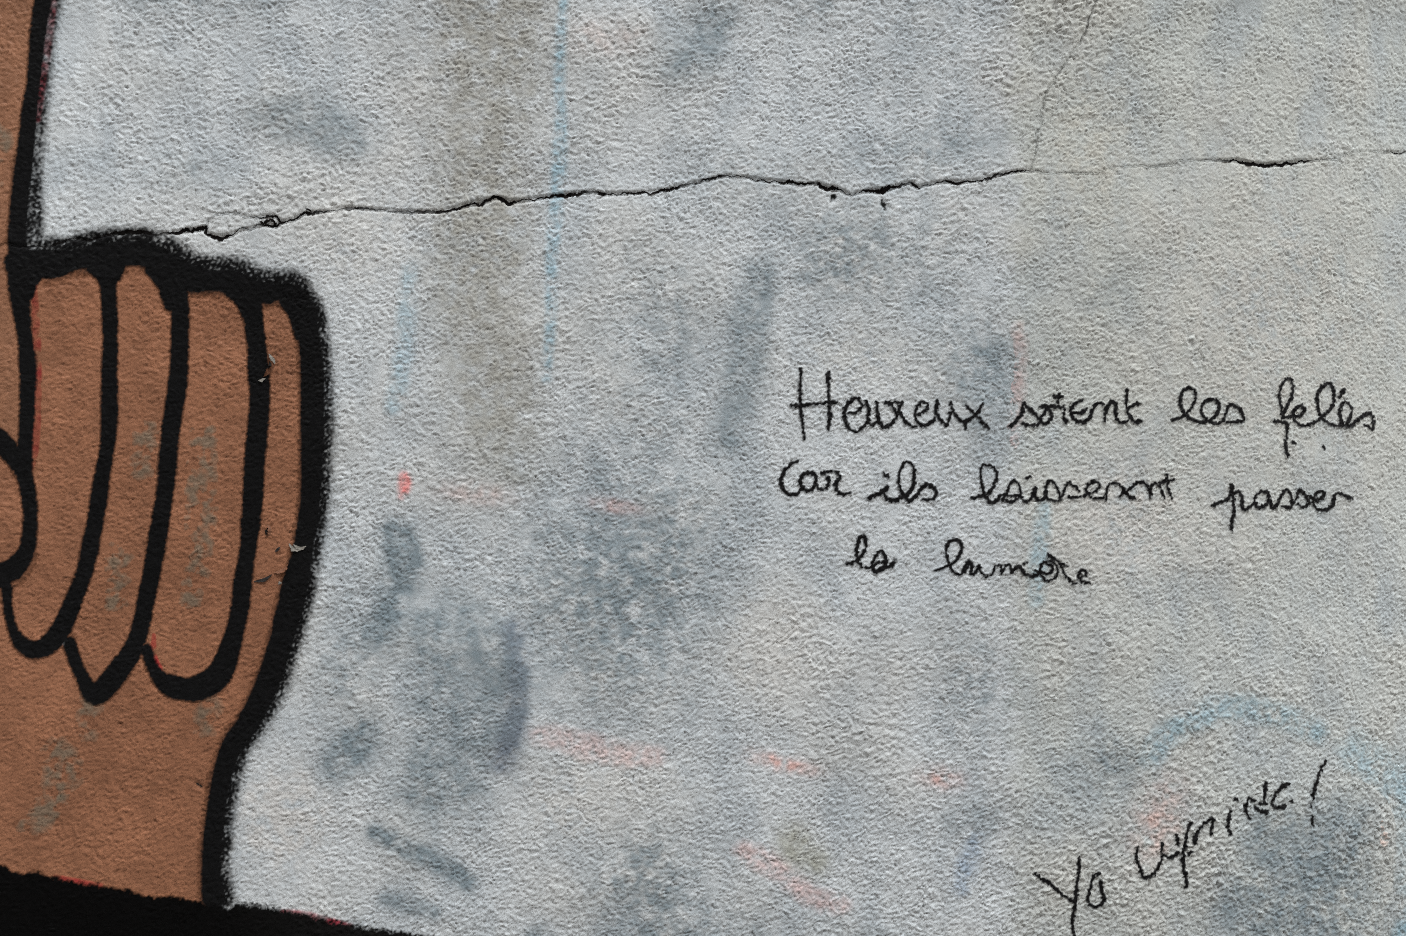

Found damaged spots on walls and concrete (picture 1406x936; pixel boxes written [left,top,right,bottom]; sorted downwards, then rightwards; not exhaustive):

crack [0,0,1406,248]